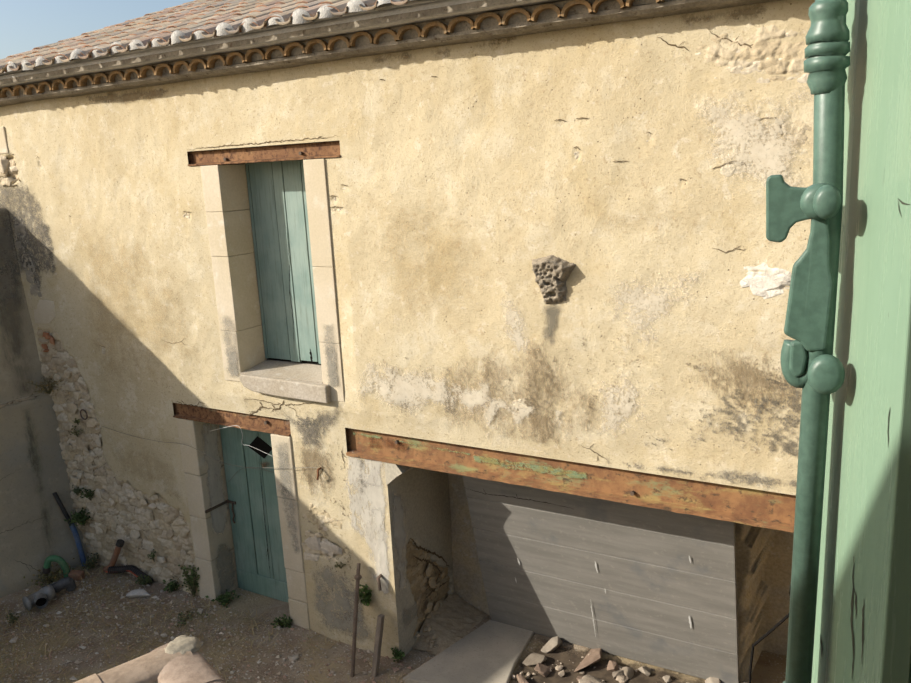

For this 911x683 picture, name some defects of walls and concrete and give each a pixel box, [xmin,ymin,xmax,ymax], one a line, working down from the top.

flaking render [695,25,809,84]
flaking render [740,263,791,299]
water stain [545,307,558,342]
crack [179,399,319,418]
water stain [445,347,606,443]
water stain [675,355,801,456]
flaking render [37,329,197,589]
flaking render [302,503,343,543]
flaking render [406,538,450,636]